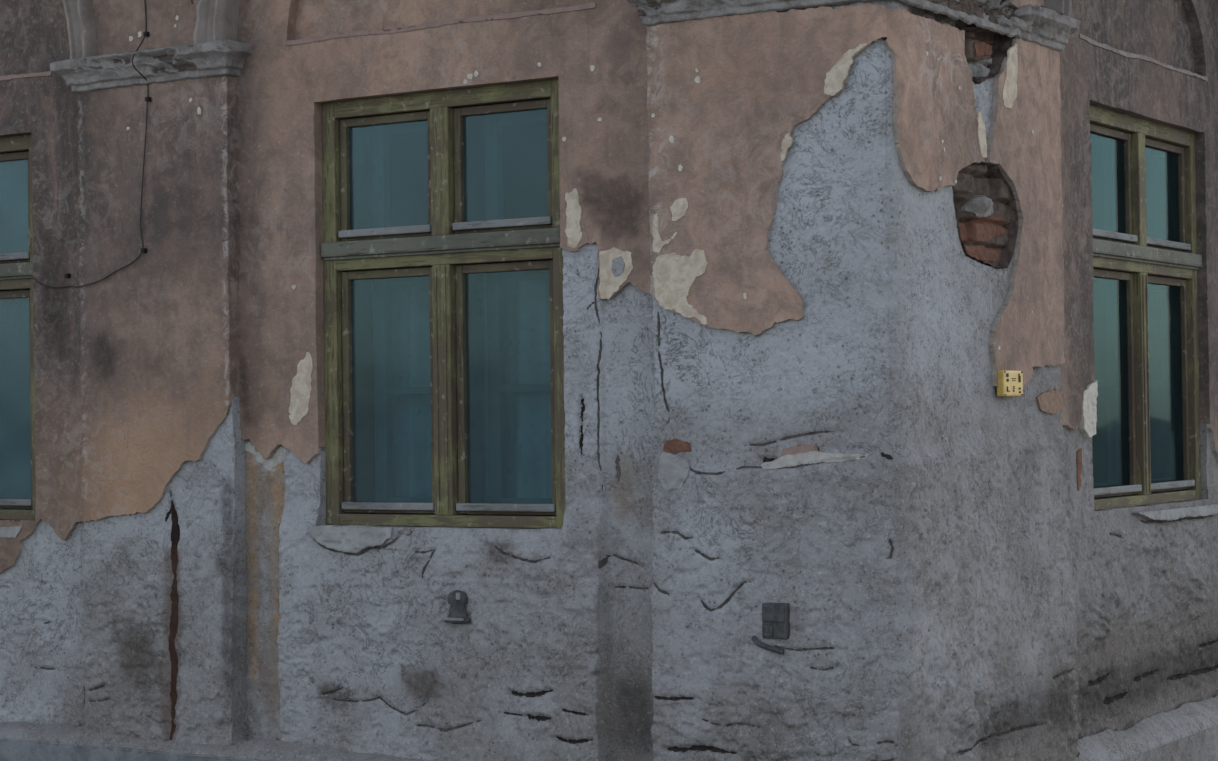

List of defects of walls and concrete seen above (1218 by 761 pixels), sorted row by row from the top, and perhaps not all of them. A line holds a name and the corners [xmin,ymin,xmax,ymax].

spalling [778,0,981,28]
peeling [565,188,582,248]
spalling [0,243,694,761]
crack [587,267,603,491]
crack [657,312,670,424]
spalling [651,37,1218,761]